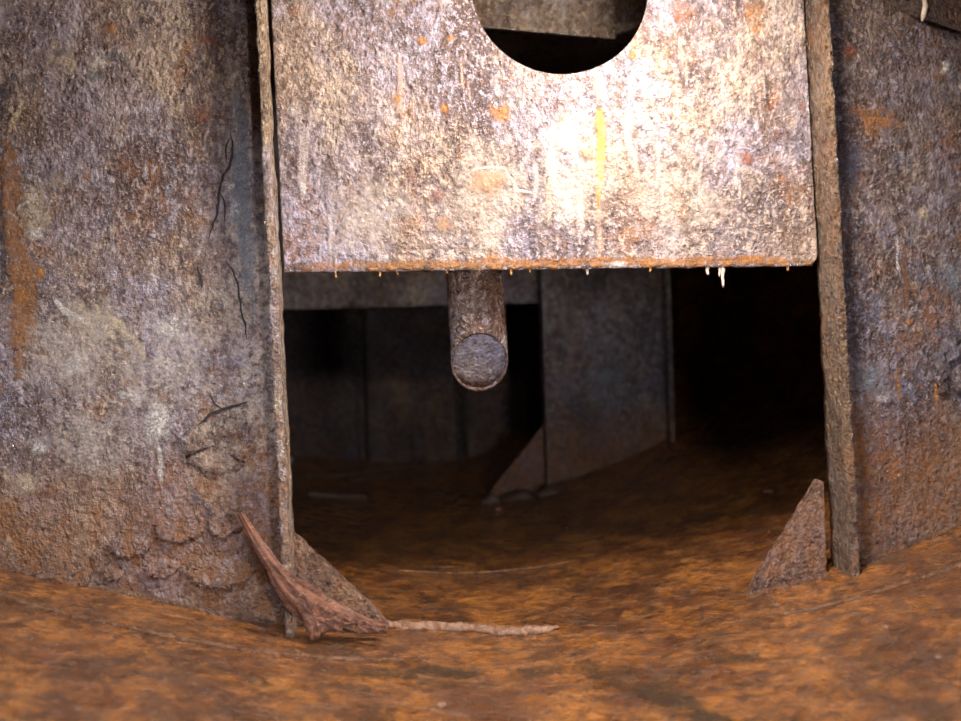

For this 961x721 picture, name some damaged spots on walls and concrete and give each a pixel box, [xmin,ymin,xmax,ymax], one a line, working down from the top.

crack [208,132,234,240]
rust [593,71,606,199]
rust [0,142,44,380]
crack [226,260,247,339]
crack [197,394,247,426]